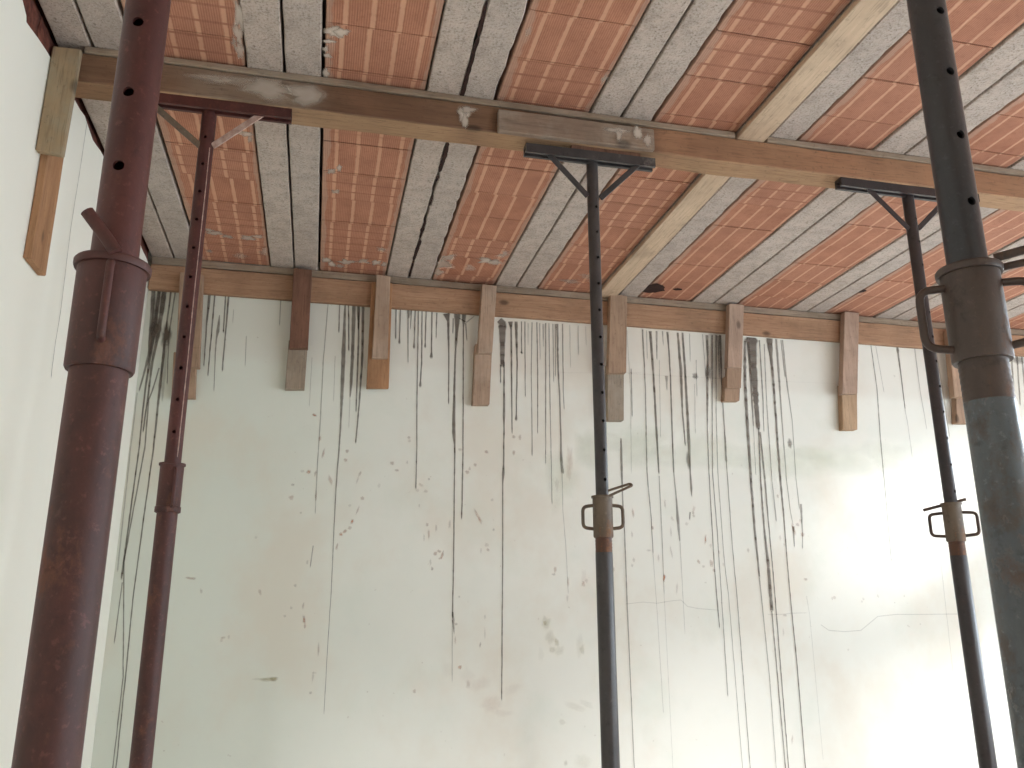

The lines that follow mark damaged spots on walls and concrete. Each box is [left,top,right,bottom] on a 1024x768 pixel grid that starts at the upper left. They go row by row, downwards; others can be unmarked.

water stain [112,291,176,768]
water stain [203,295,229,381]
water stain [326,305,364,670]
water stain [395,310,467,630]
water stain [498,318,564,699]
water stain [631,329,692,546]
water stain [706,335,750,768]
water stain [744,337,806,768]